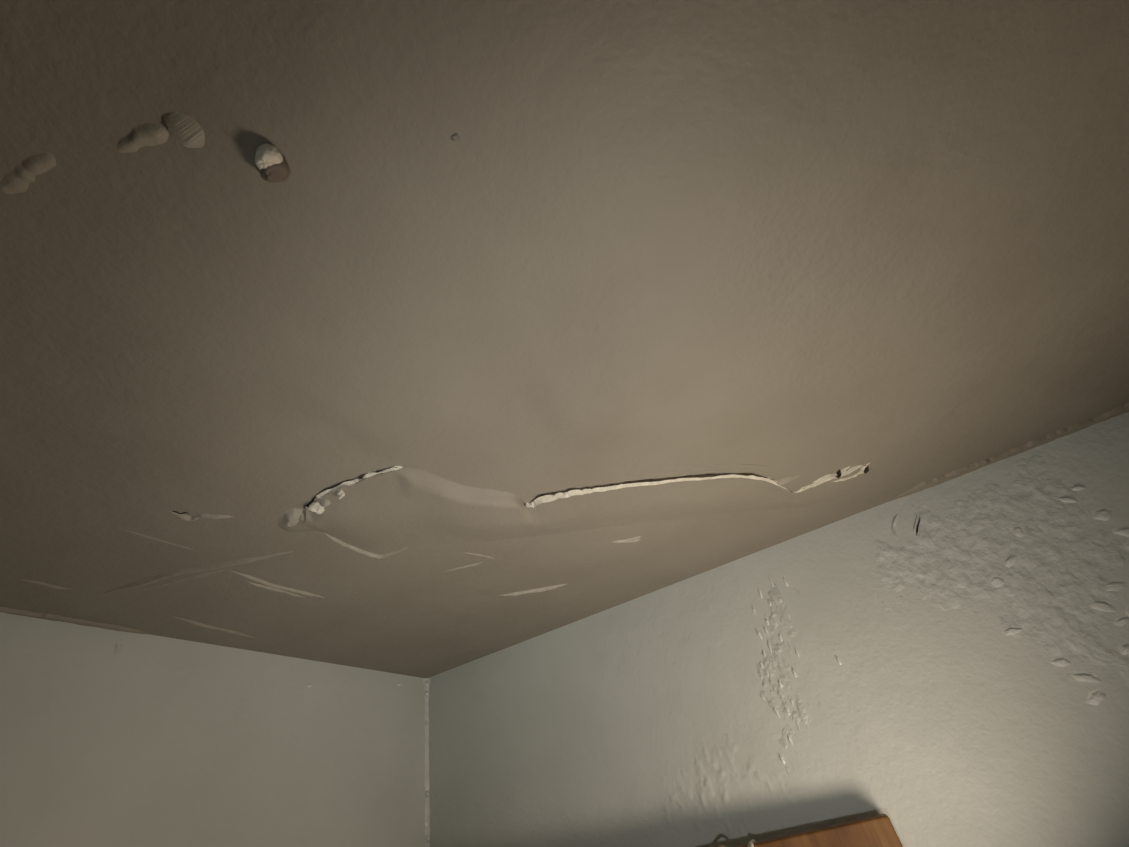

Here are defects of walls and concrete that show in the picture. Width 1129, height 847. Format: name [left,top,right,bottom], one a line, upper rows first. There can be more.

spalling [255,143,283,170]
crack [283,465,406,527]
crack [526,462,871,508]